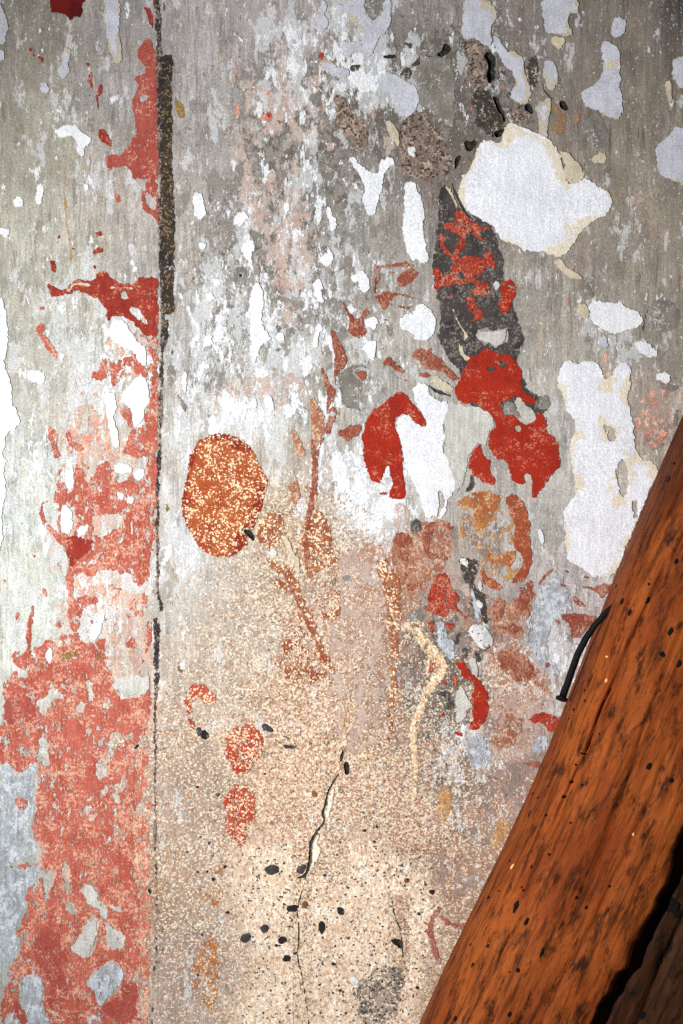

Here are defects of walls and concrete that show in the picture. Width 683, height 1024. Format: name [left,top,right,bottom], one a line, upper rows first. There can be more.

peeling [311,0,396,78]
spalling [377,0,568,207]
peeling [541,0,579,37]
peeling [574,16,626,150]
peeling [672,56,683,88]
peeling [476,329,506,345]
peeling [0,231,187,1024]
crack [296,750,344,1024]